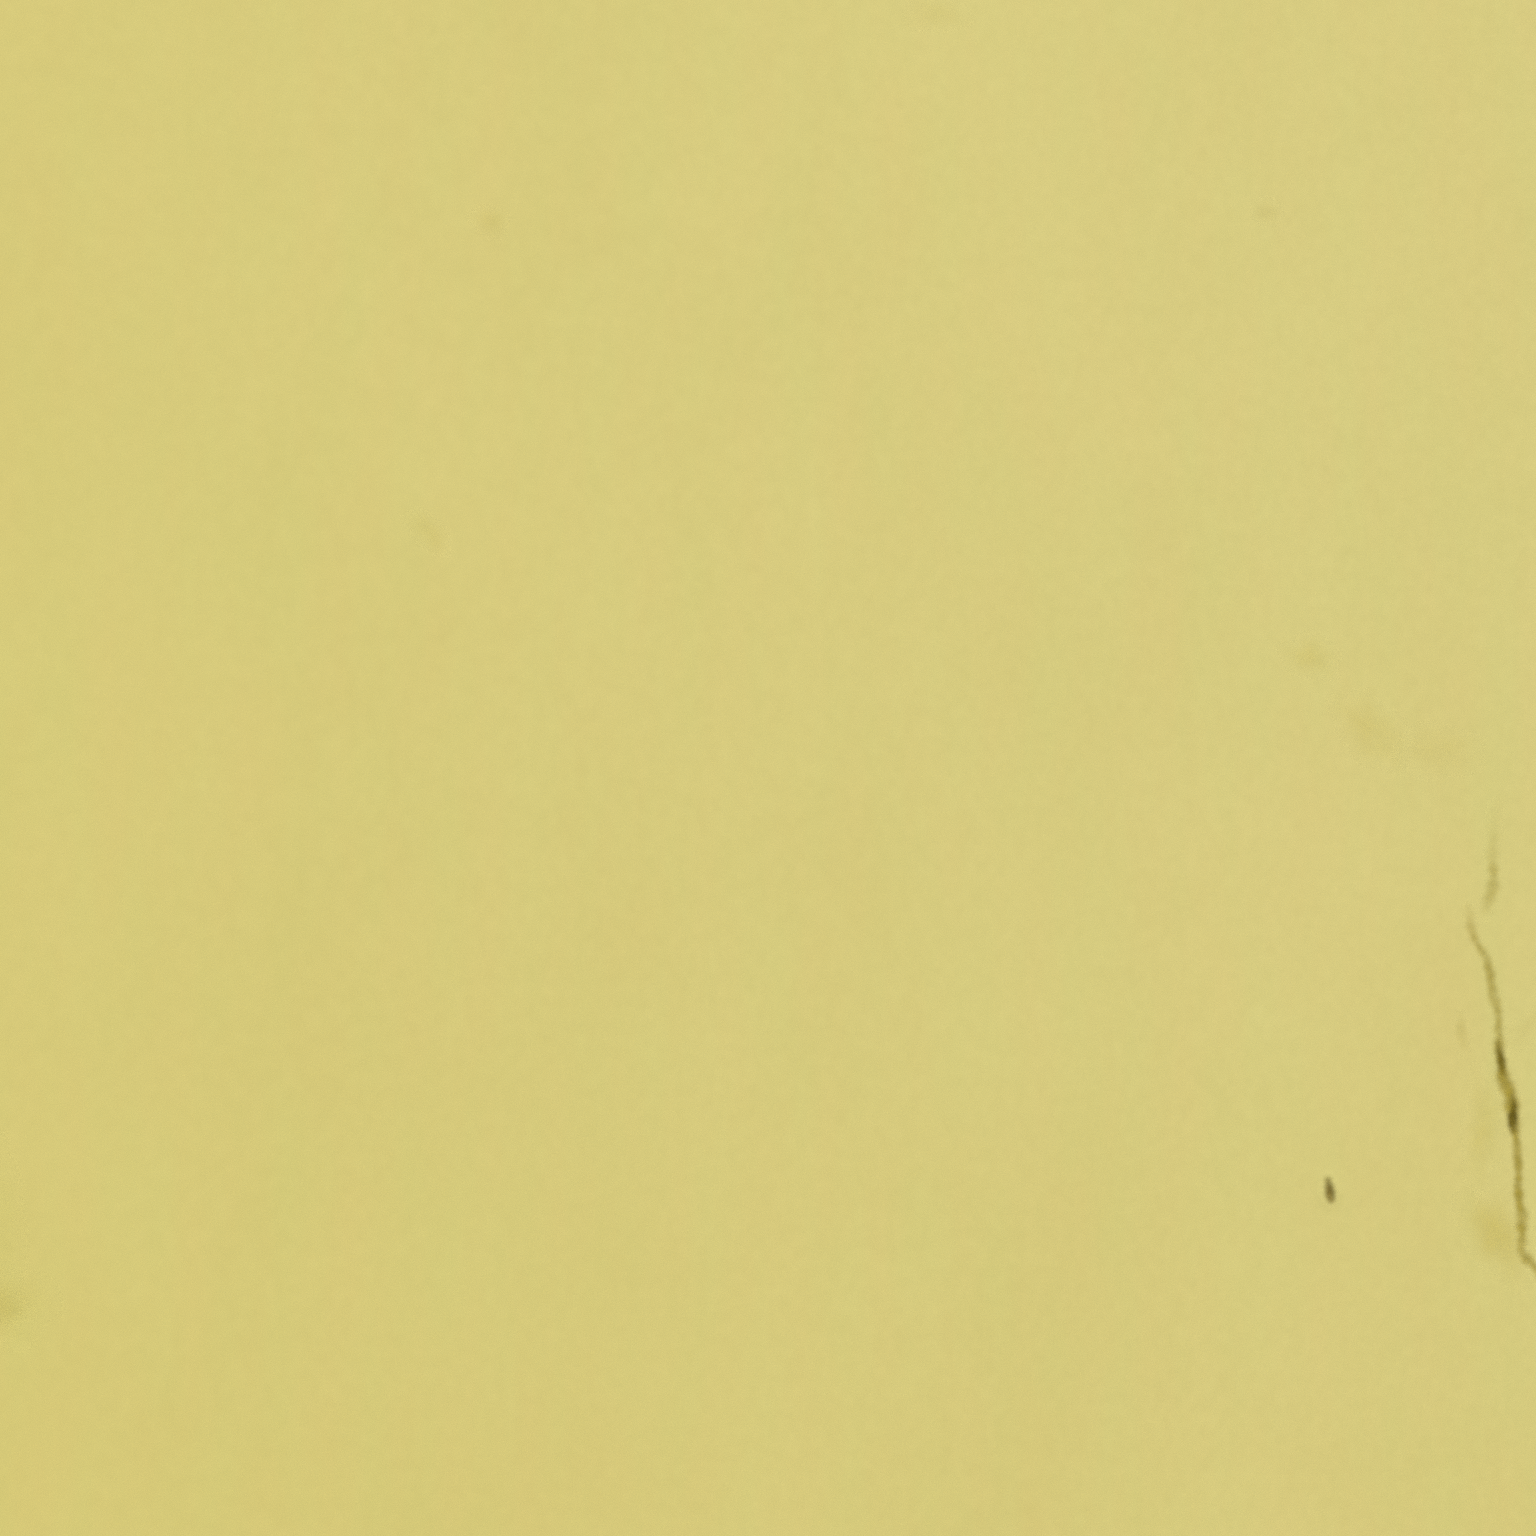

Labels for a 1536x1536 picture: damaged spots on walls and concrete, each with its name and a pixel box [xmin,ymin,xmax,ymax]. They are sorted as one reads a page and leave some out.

crack [1496,1043,1526,1261]